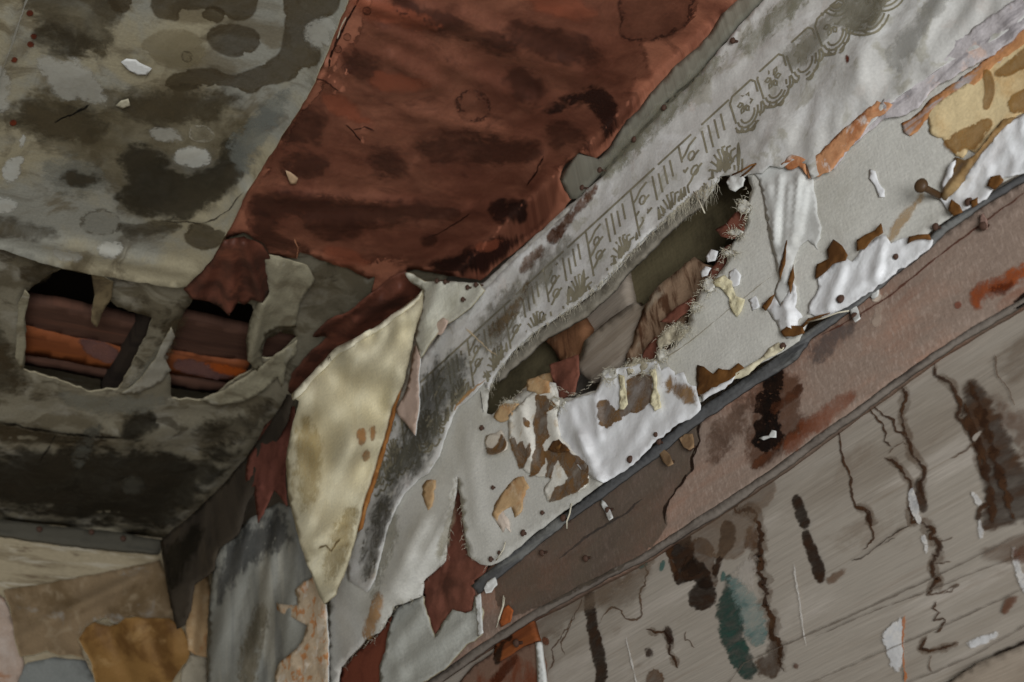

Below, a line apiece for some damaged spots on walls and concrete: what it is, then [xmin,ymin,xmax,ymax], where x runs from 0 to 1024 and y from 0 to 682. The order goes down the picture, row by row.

leakage [0,0,344,250]
rust [547,185,597,244]
peeling [485,0,1024,532]
rust [954,263,1024,309]
leakage [0,400,271,532]
leakage [495,372,801,682]
crack [852,526,909,561]
leakage [934,356,1024,530]